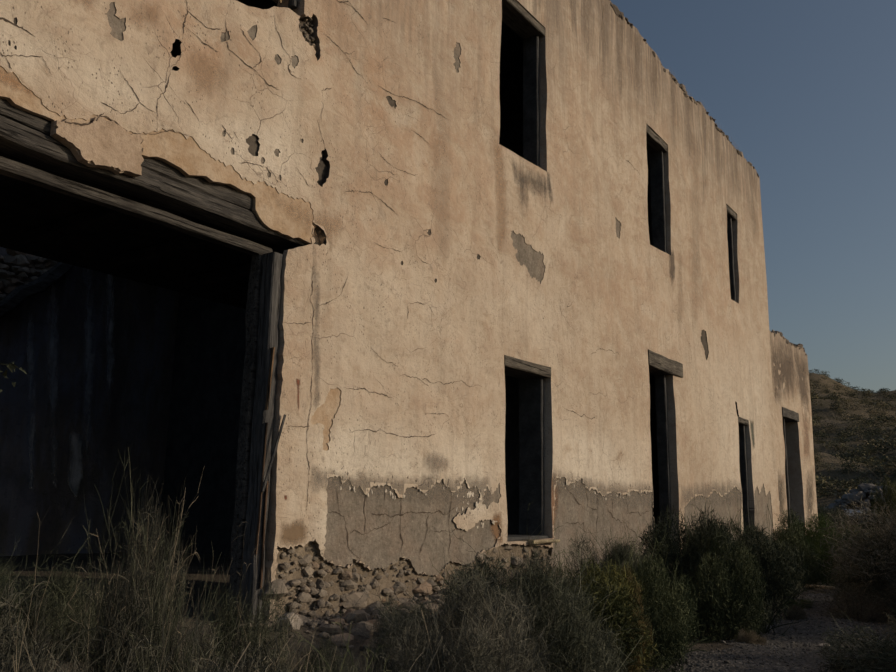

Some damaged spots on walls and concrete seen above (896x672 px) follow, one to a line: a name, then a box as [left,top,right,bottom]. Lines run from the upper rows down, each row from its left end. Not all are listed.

crack [0,17,50,70]
spalling [170,39,182,71]
crack [61,1,295,153]
spalling [298,14,321,61]
peeling [128,128,327,246]
spalling [315,149,330,187]
water stain [514,166,552,199]
crack [285,264,348,514]
crack [353,413,448,438]
crack [329,487,460,559]
spalling [316,472,502,576]
spalling [550,477,654,580]